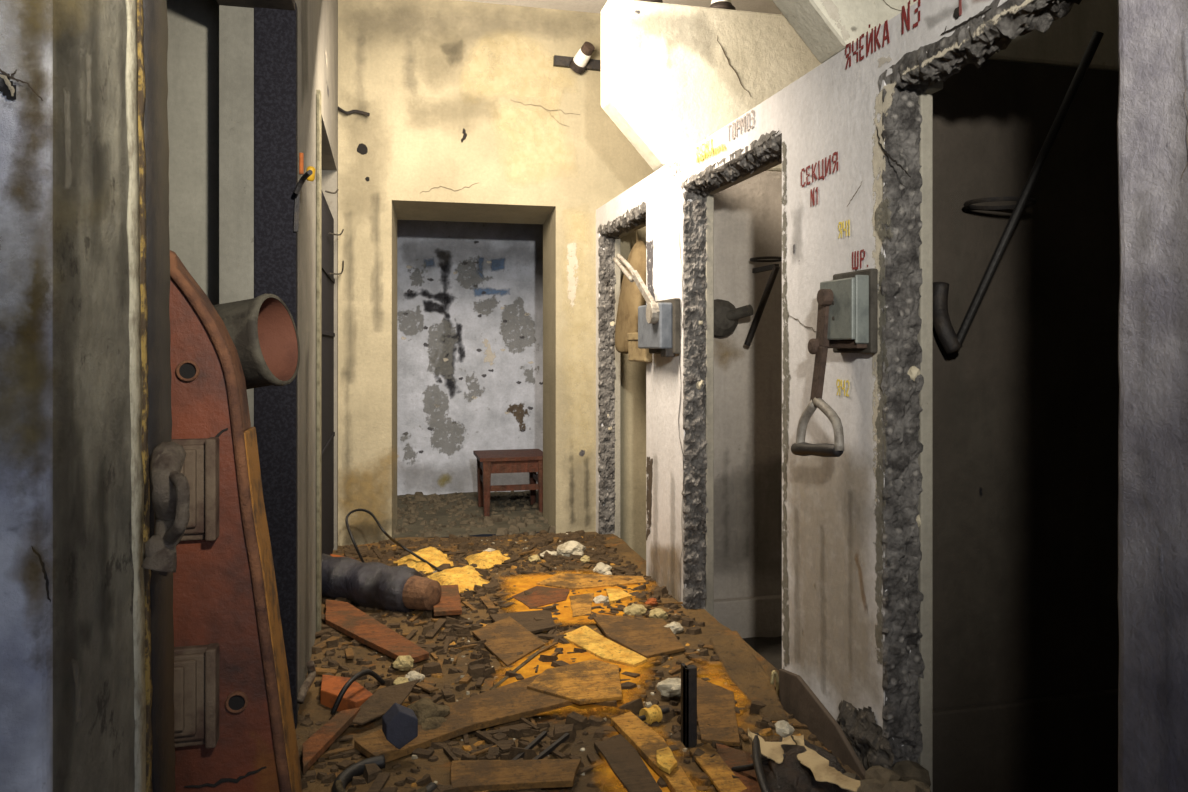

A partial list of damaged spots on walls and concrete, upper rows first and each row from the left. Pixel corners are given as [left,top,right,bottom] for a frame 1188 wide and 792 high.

crack [0,69,43,101]
water stain [0,65,50,473]
peeling [397,241,543,464]
spalling [579,201,646,538]
spalling [646,239,655,300]
spalling [681,130,790,669]
spalling [836,0,1082,792]